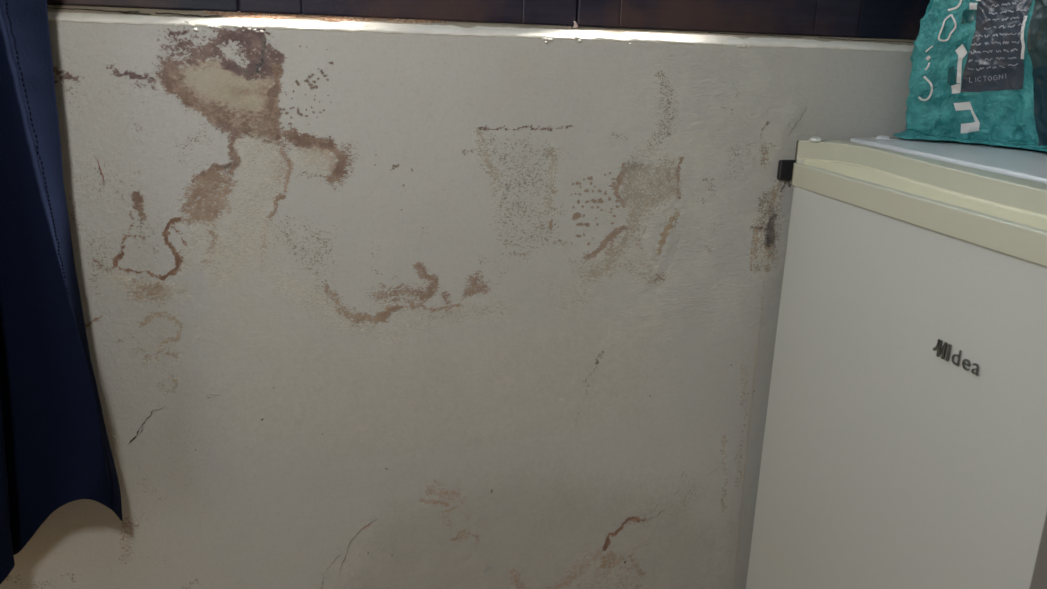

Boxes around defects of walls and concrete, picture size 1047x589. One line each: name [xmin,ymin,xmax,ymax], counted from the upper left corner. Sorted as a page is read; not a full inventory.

water stain [53,66,84,95]
water stain [106,27,775,330]
water stain [749,180,791,273]